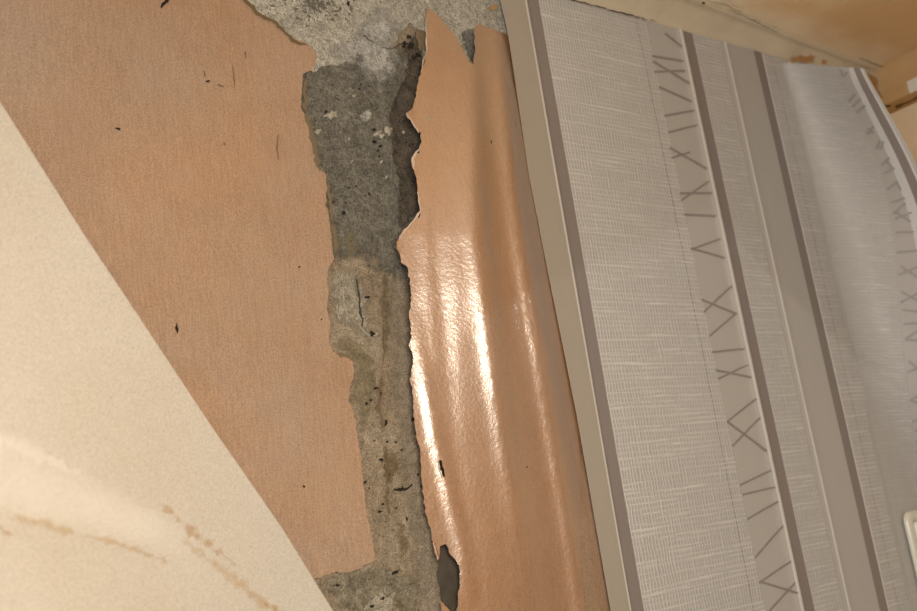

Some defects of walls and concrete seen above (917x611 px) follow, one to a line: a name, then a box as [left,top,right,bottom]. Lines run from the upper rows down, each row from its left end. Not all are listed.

peeling [0,0,611,611]